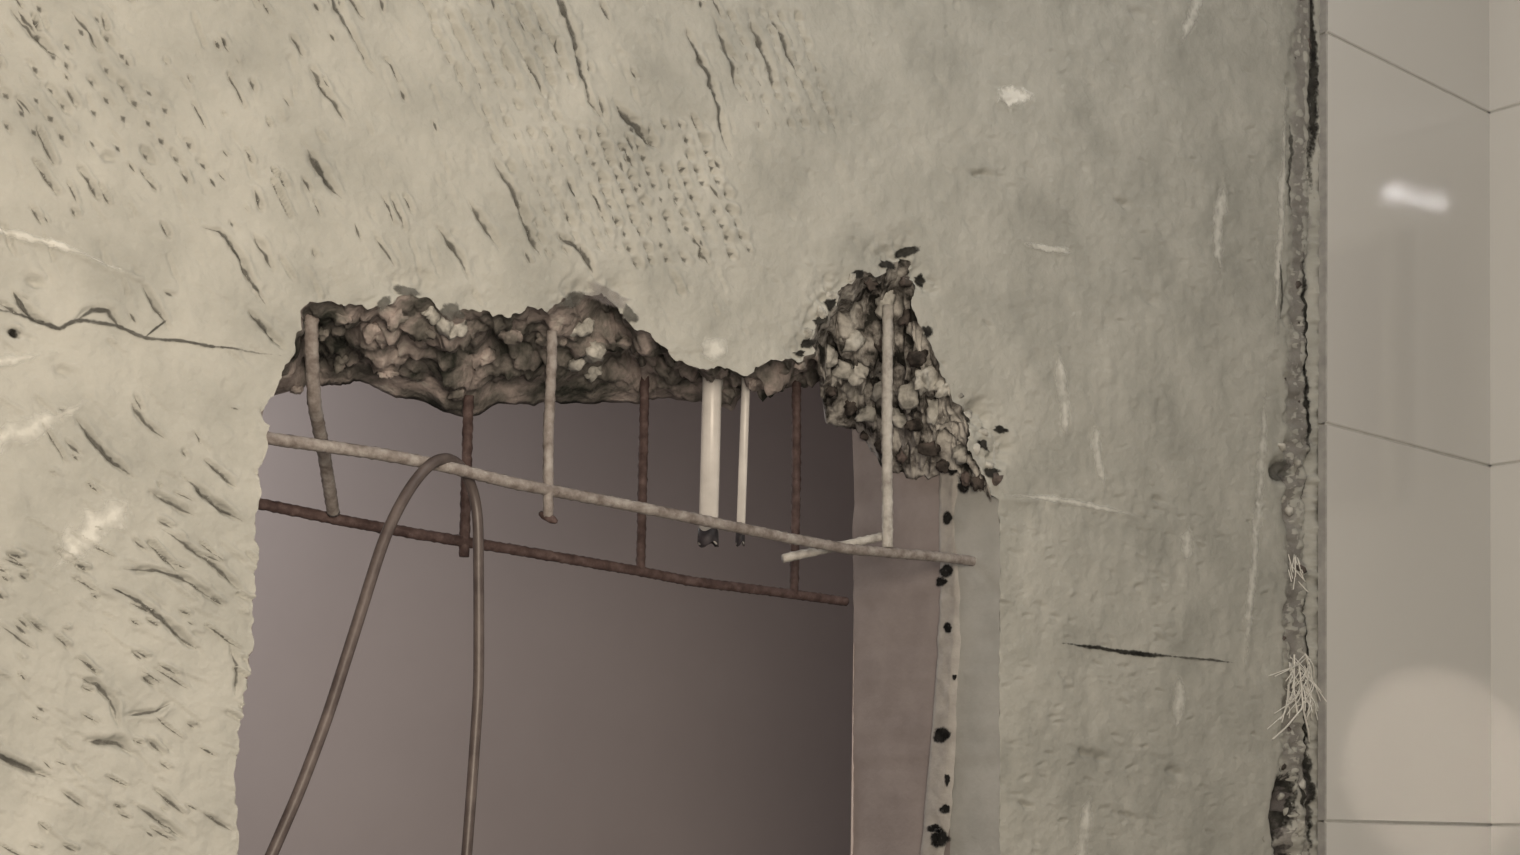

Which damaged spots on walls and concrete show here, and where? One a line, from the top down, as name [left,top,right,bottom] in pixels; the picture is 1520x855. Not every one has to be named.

crack [1287,0,1319,206]
crack [0,295,238,350]
spalling [563,240,591,269]
spalling [258,246,1009,606]
crack [1279,261,1311,498]
crack [1063,643,1228,663]